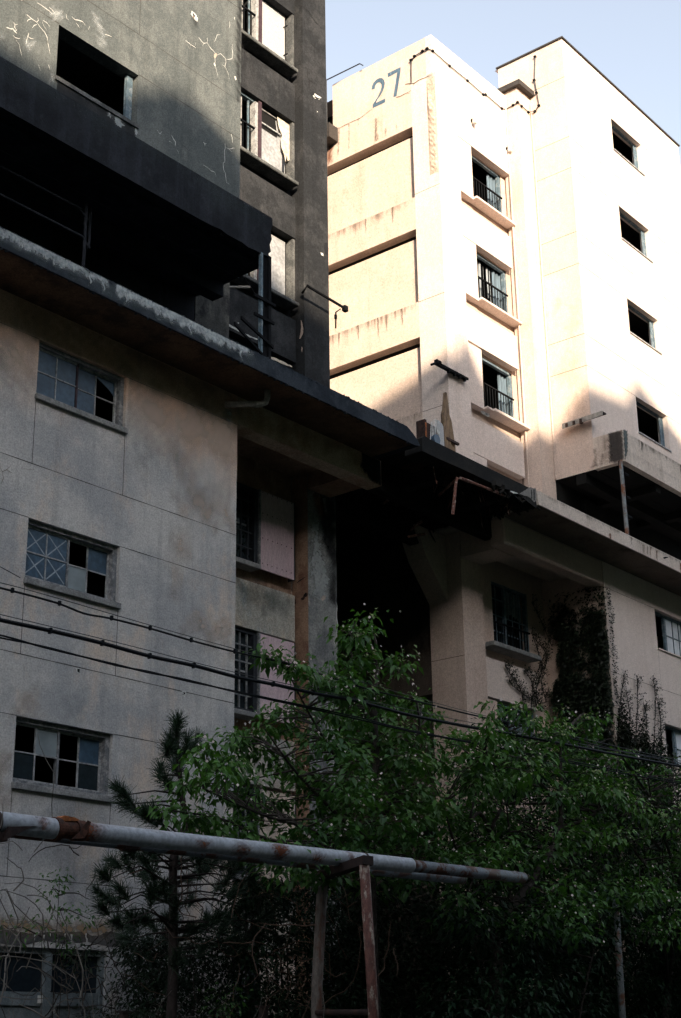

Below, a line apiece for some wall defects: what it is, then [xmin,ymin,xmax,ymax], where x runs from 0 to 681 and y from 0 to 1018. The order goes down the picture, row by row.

crack [7,3,109,69]
crack [188,21,233,76]
water stain [0,227,250,356]